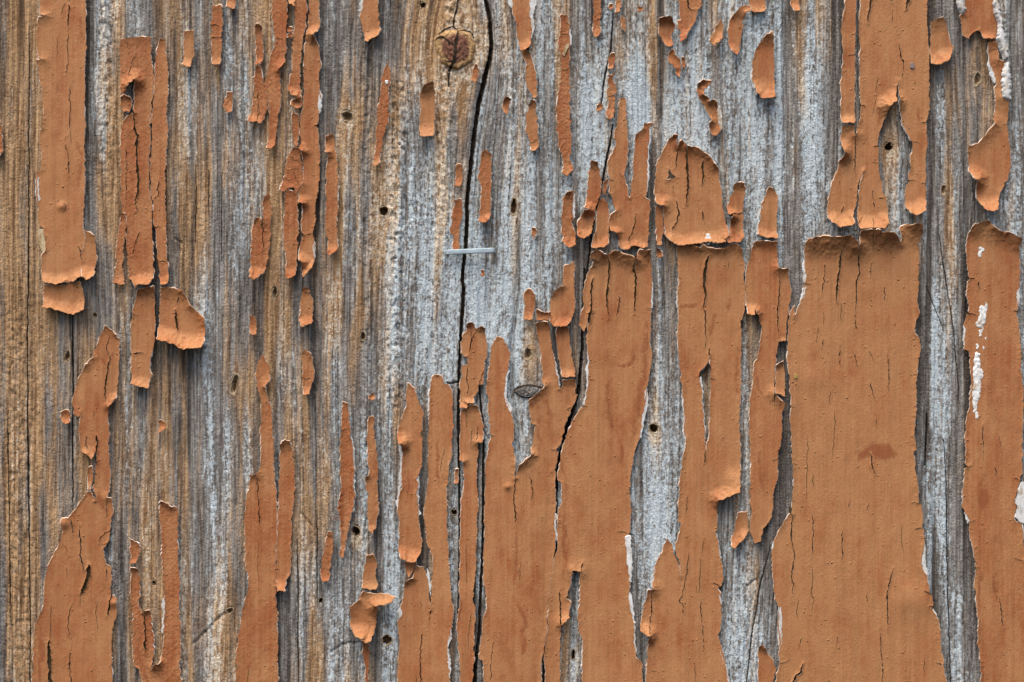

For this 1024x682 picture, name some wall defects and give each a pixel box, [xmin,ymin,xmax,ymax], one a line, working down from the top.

peeling [31,0,206,682]
peeling [235,354,296,682]
peeling [248,0,340,327]
crack [435,0,493,682]
crack [541,620,549,682]
crack [554,13,614,556]
peeling [349,0,1024,682]